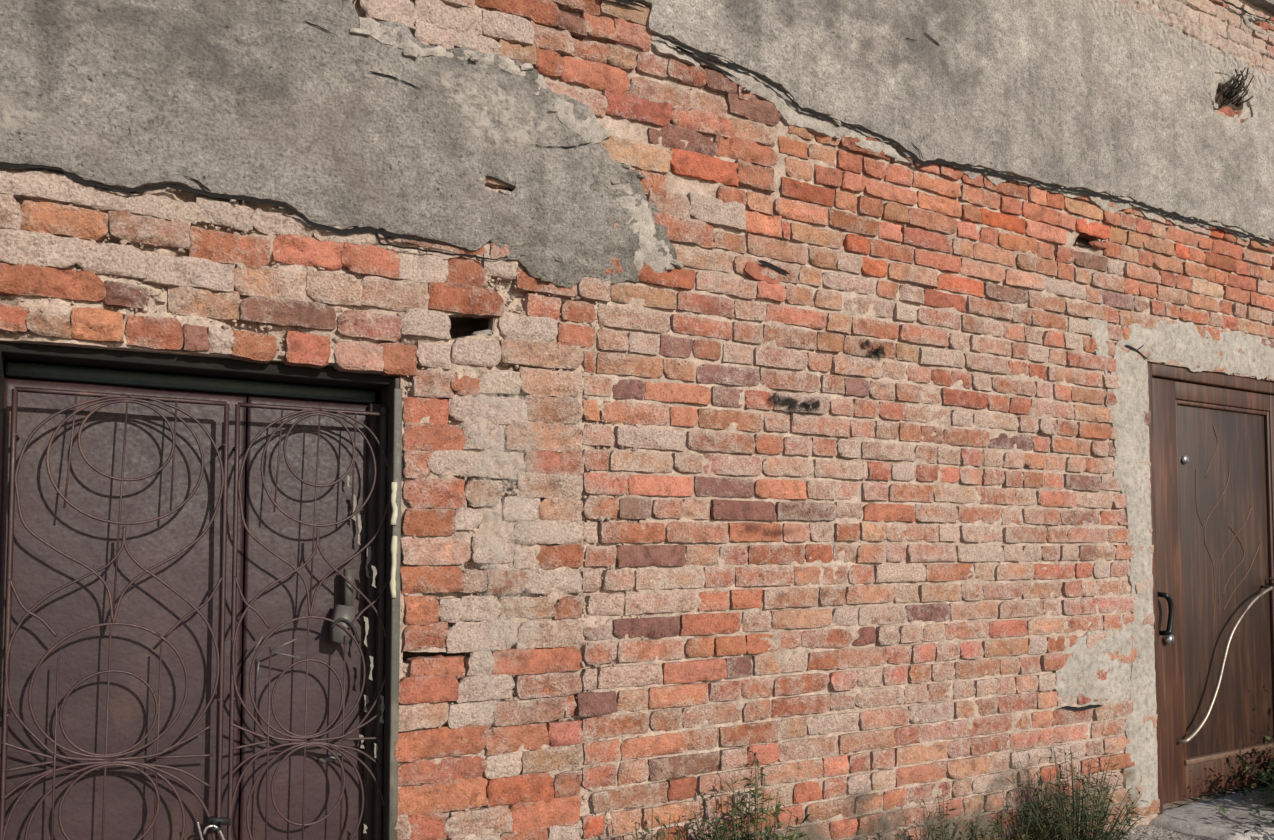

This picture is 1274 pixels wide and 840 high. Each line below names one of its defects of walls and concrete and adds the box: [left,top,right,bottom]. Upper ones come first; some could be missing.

crack [370,71,421,90]
peeling [349,17,684,288]
crack [532,141,590,149]
peeling [651,34,912,164]
crack [615,0,1274,244]
spalling [1211,67,1254,124]
crack [0,163,524,260]
peeling [937,162,1274,254]
hole [449,316,496,339]
peeling [347,475,398,598]
peeling [363,616,374,681]
spalling [402,651,467,663]